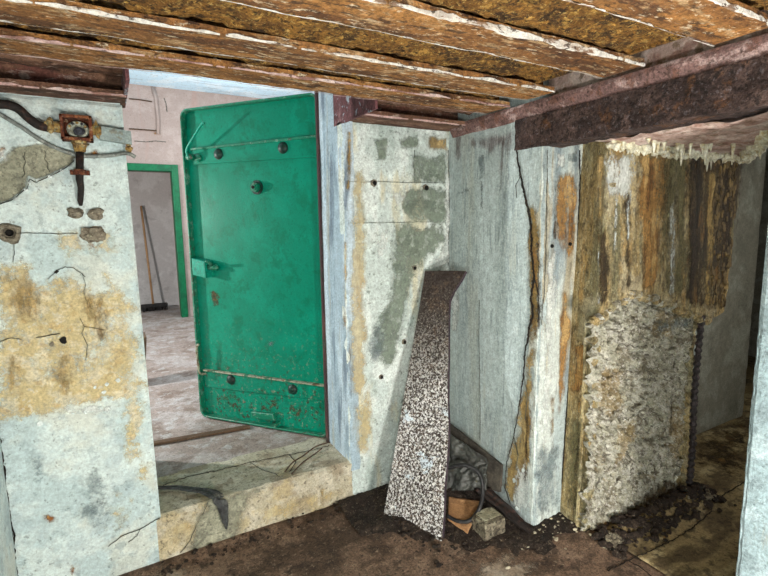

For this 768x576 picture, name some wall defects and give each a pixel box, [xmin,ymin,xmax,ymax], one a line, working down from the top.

spalling [0,144,76,204]
damp [0,264,146,460]
crack [48,267,102,357]
crack [165,445,329,485]
damp [343,132,450,451]
rust [505,207,542,501]
crack [504,150,548,503]
rust [553,174,577,256]
rust [551,293,583,433]
spalling [533,290,713,541]
damp [605,130,768,310]